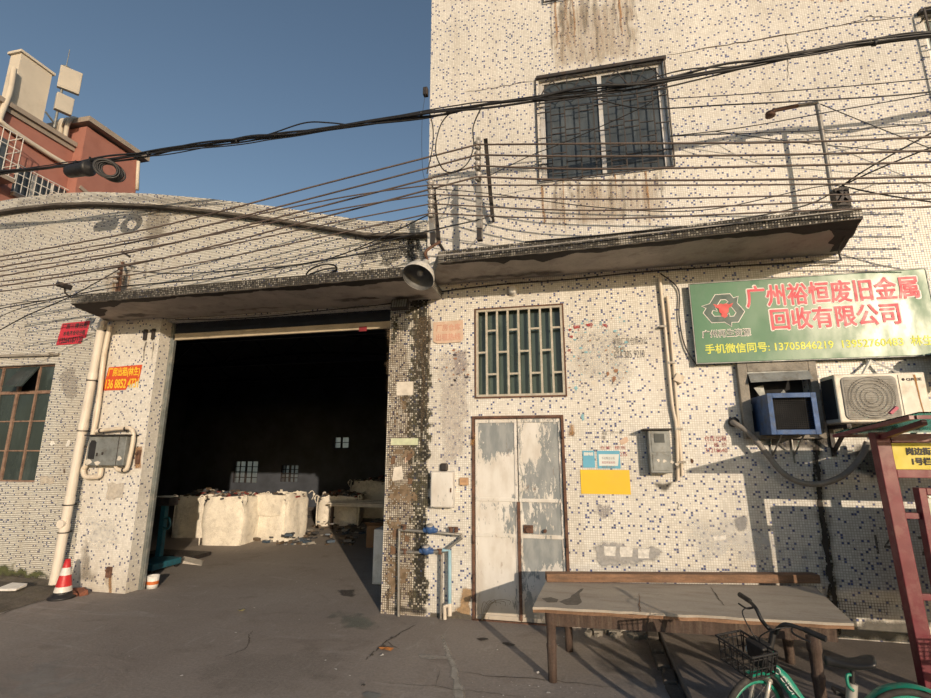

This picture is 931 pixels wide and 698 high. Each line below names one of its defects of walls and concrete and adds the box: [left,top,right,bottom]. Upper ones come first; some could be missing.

water stain [391,295,472,620]
water stain [766,437,838,608]